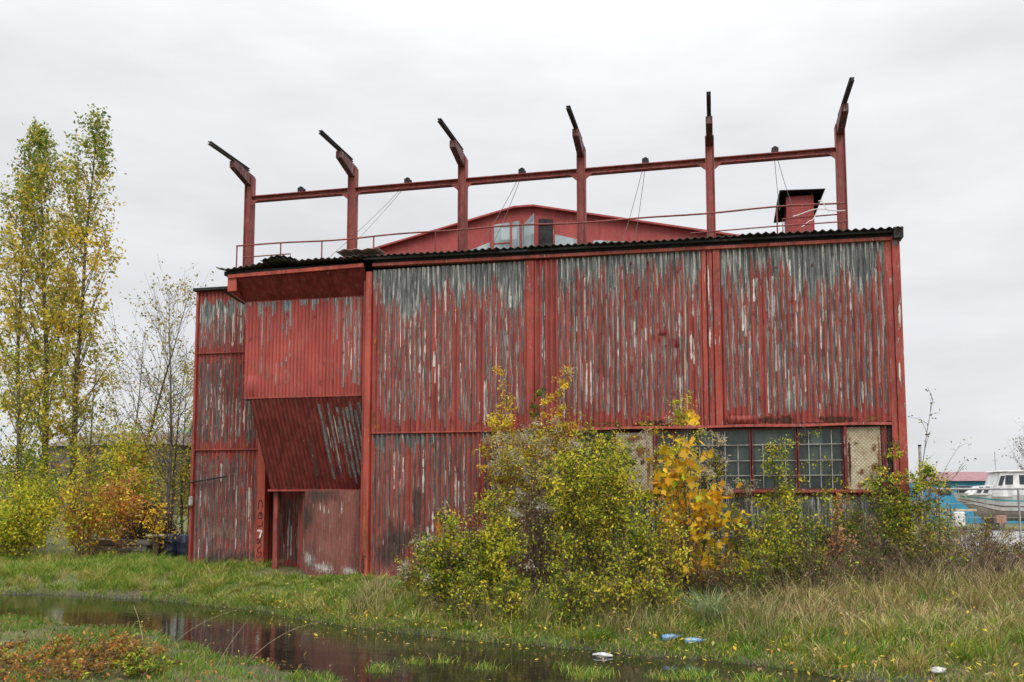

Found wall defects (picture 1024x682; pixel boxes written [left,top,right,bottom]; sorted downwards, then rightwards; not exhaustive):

peeling [194,261,565,576]
peeling [541,240,901,422]